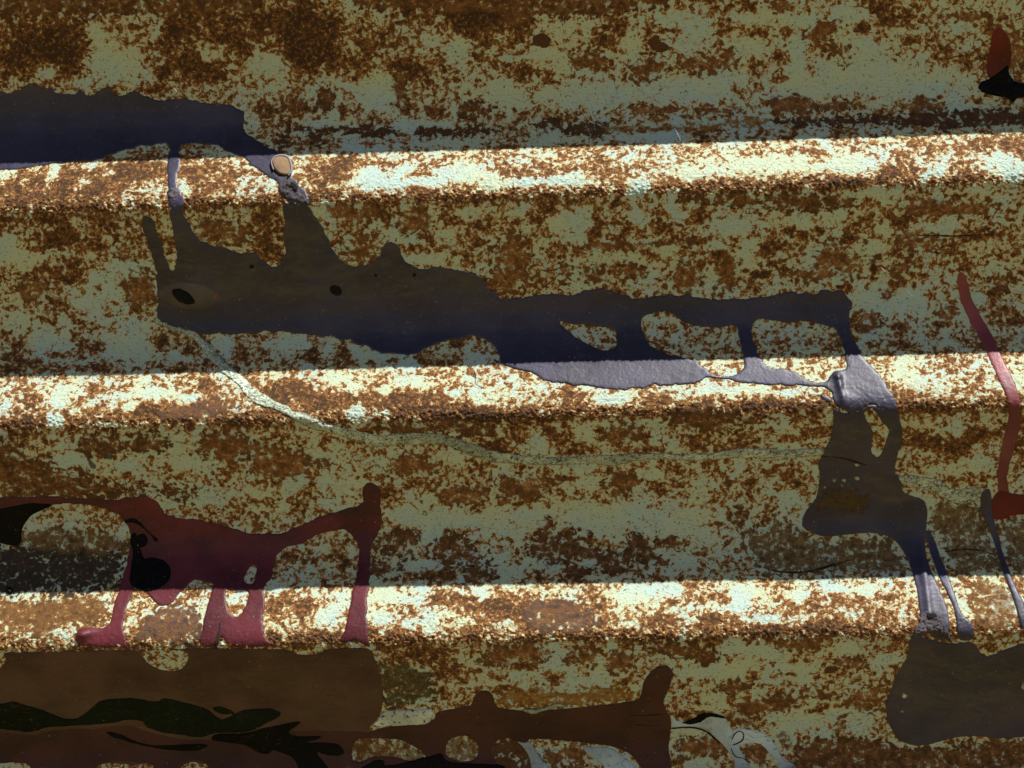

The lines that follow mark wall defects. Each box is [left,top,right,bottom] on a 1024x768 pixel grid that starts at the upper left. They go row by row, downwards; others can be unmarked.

corrosion [528,93,1024,139]
corrosion [675,188,859,215]
corrosion [555,236,743,297]
corrosion [0,396,333,507]
corrosion [375,448,564,508]
corrosion [0,526,131,643]
corrosion [369,526,500,589]
corrosion [522,515,686,577]
corrosion [730,505,910,584]
corrosion [928,499,1024,632]
corrosion [474,592,725,709]
corrosion [712,654,1024,768]